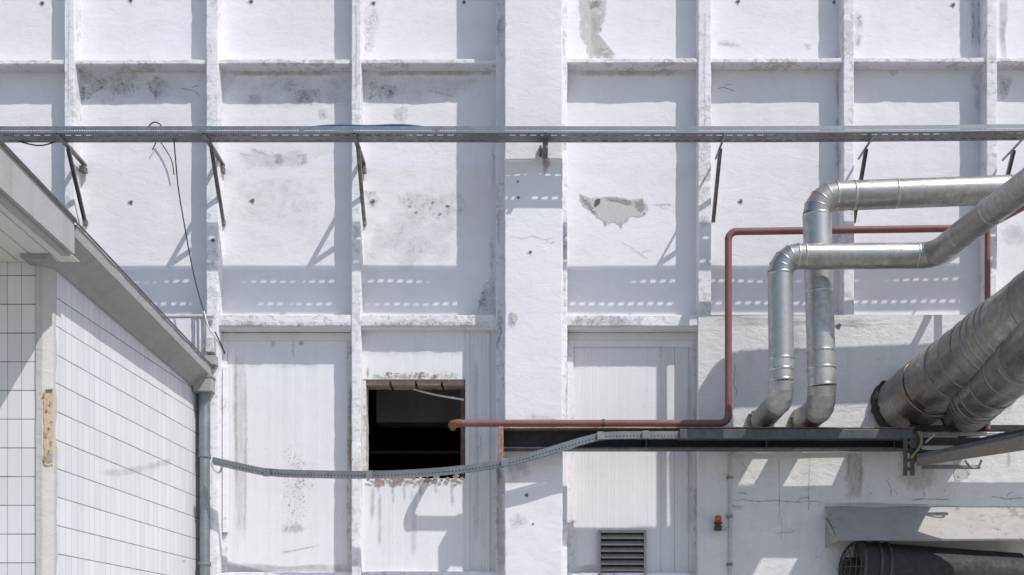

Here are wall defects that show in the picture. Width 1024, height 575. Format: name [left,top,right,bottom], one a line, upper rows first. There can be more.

peeling [579,0,614,59]
flaking render [580,194,648,227]
spalling [373,372,458,380]
flaking render [42,388,54,466]
crack [742,465,817,537]